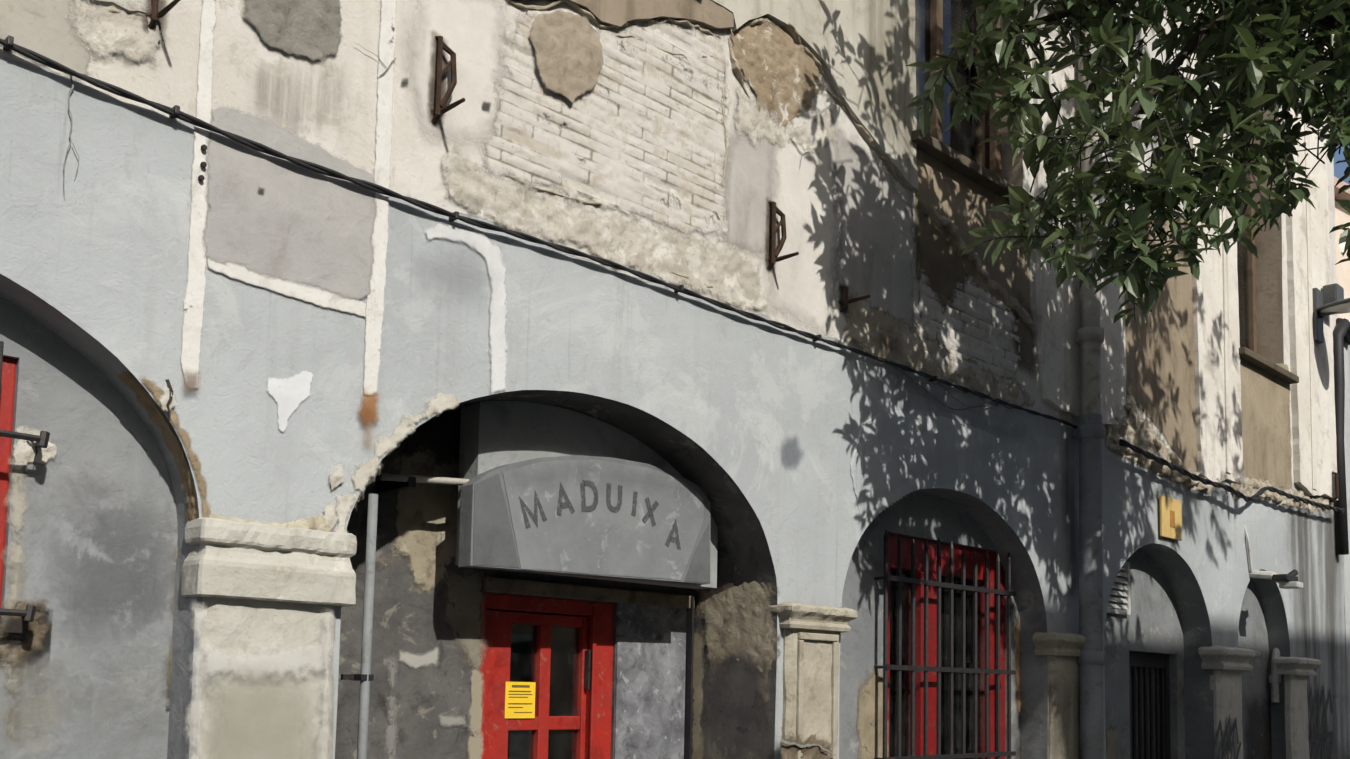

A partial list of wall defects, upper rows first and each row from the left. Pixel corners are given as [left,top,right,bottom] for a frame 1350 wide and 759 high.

flaking render [442,0,905,310]
flaking render [845,204,1035,408]
rust [359,394,378,424]
spalling [1105,396,1333,512]
flaking render [118,371,489,759]
peeling [692,581,781,759]